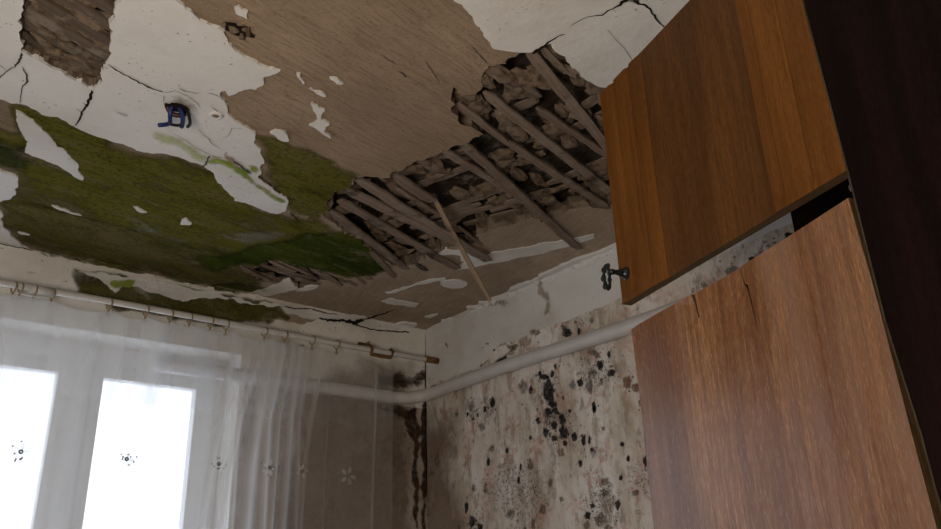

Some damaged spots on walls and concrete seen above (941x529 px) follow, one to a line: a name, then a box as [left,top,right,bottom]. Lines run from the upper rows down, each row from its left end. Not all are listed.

crack [532,0,664,60]
crack [0,53,29,102]
flaking render [0,99,90,219]
crack [75,90,93,126]
flaking render [106,139,211,172]
flaking render [181,0,519,253]
flaking render [10,205,617,336]
mould [561,318,593,337]
leakage [331,336,426,391]
leakage [288,395,563,529]
leakage [455,388,496,431]
leakage [512,350,651,529]